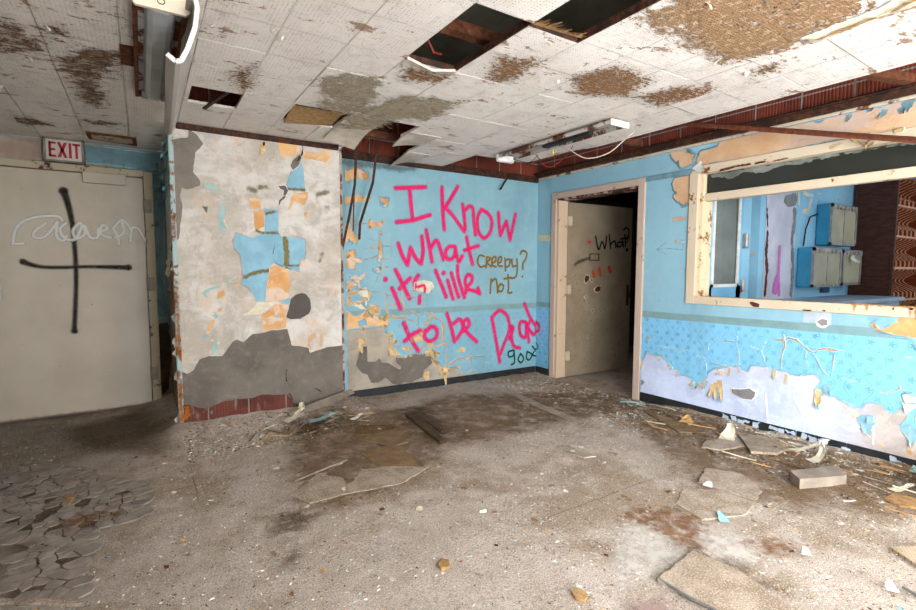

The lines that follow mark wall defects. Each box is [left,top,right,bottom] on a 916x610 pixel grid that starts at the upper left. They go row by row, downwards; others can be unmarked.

leakage [0,17,129,128]
leakage [307,64,464,131]
leakage [476,53,543,85]
leakage [560,59,722,108]
leakage [629,0,876,84]
peeling [800,0,916,44]
peeling [669,99,916,246]
peeling [85,130,472,423]
peeling [748,208,769,308]
peeling [784,191,821,297]
peeling [868,307,916,347]
flaking render [640,352,916,464]